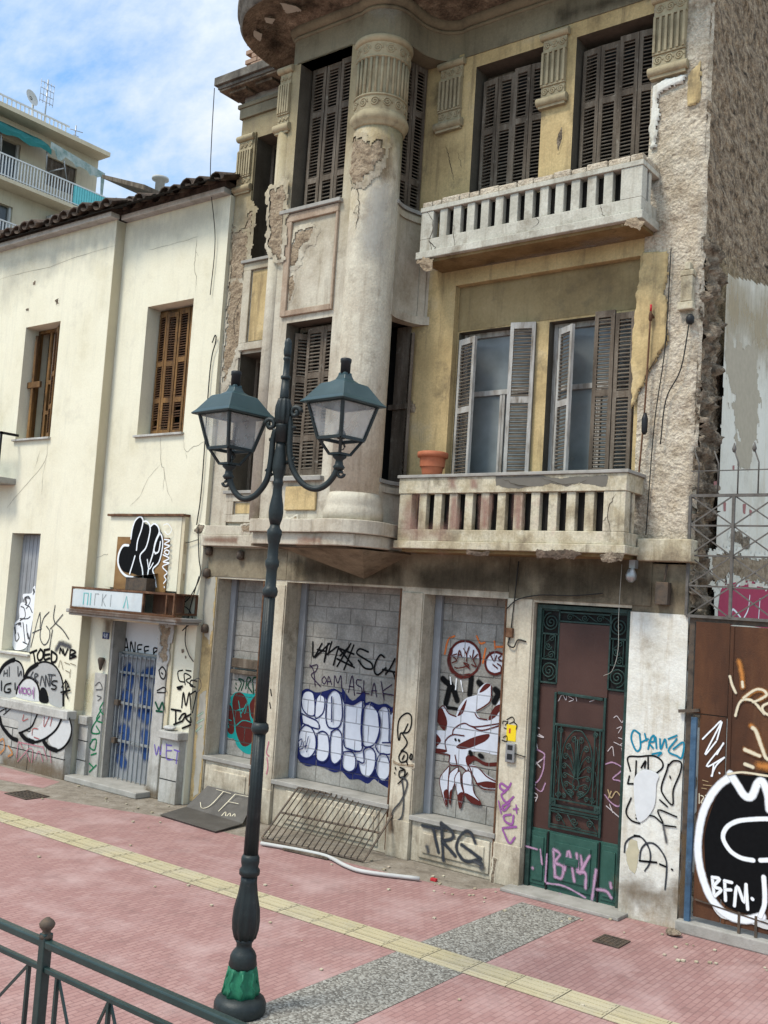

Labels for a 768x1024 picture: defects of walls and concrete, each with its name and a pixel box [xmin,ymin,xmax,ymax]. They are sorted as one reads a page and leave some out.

peeling [253,3,301,41]
peeling [648,61,702,150]
spalling [349,131,392,189]
spalling [220,176,321,391]
peeling [631,251,669,408]
peeling [725,334,762,470]
peeling [496,475,608,489]
spalling [536,549,581,560]